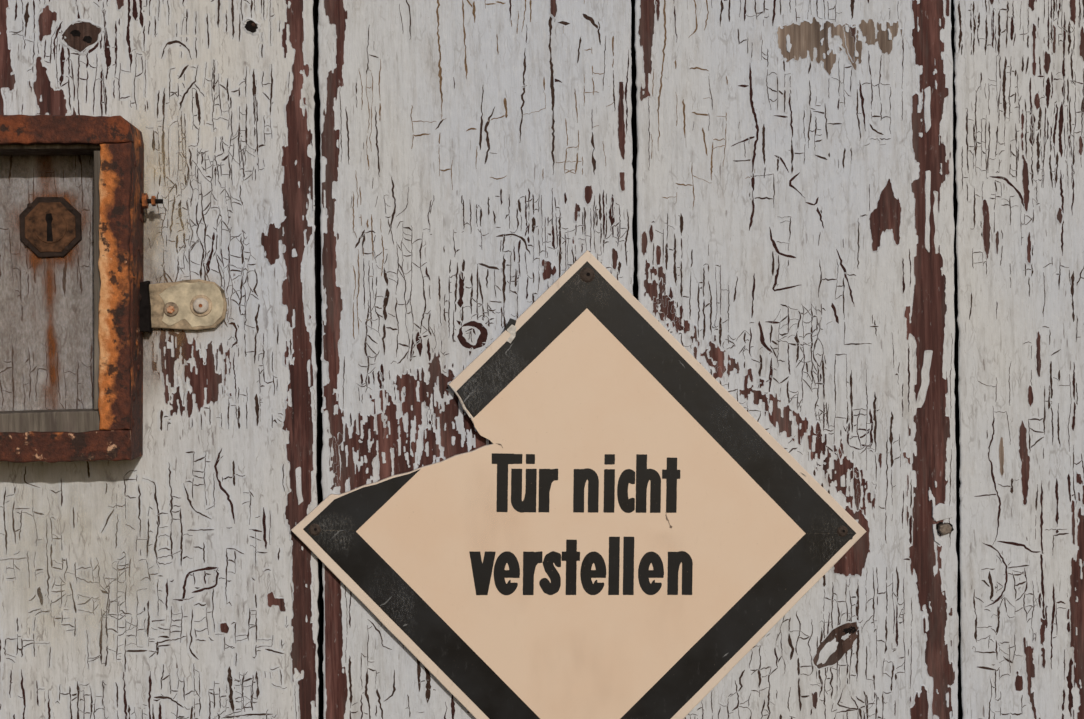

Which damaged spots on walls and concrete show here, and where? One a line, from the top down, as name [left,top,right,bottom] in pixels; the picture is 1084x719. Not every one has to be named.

peeling [0,0,77,116]
corrosion [29,249,74,302]
corrosion [48,327,57,395]
crack [0,0,299,719]
peeling [150,328,232,418]
peeling [260,0,493,719]
crack [338,0,914,719]
peeling [639,223,877,578]
peeling [775,0,956,719]
crack [947,0,1084,719]
peeling [1014,604,1049,719]
peeling [1065,470,1084,719]